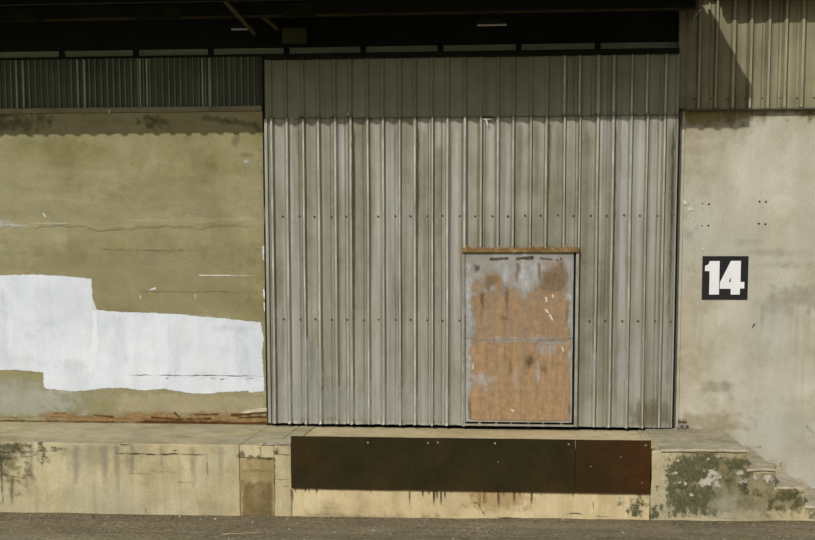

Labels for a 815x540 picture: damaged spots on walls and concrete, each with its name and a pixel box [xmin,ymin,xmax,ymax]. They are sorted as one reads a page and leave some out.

leakage [678,108,754,126]
corrosion [468,263,570,421]
corrosion [35,408,268,425]